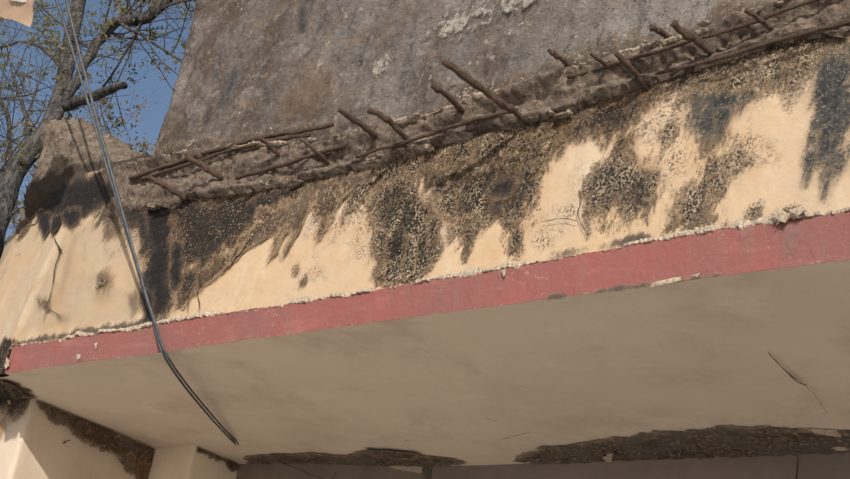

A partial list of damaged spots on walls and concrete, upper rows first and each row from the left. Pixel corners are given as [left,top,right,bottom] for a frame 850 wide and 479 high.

damp [15,37,850,345]
spalling [107,0,850,312]
crack [38,238,63,320]
crack [768,352,826,411]
spalling [513,425,850,464]